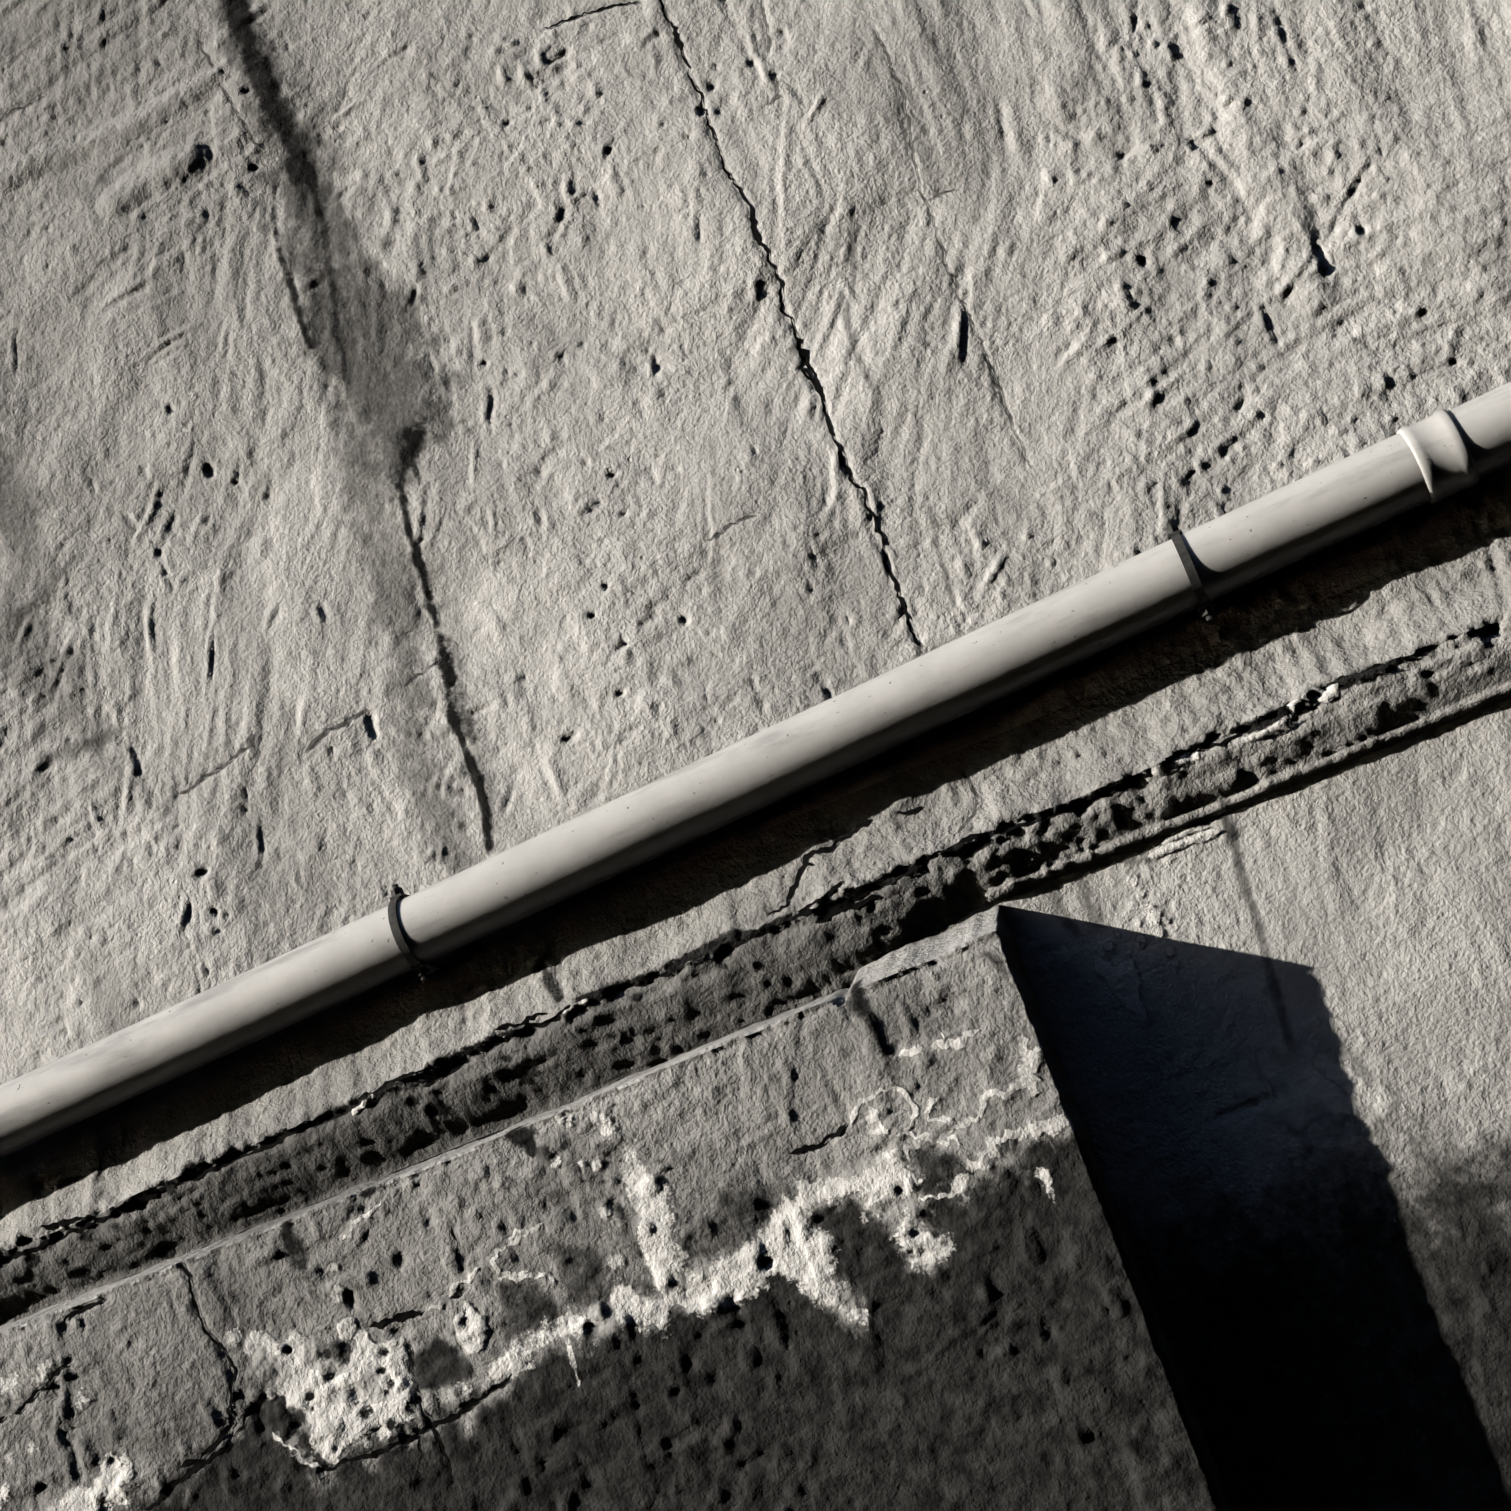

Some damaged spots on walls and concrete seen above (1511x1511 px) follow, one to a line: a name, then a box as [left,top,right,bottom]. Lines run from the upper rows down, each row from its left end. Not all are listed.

water stain [219,0,492,853]
crack [543,0,923,648]
crack [873,29,1032,469]
crack [0,701,1291,1264]
spalling [665,913,793,975]
water stain [845,980,894,1077]
spalling [1030,781,1122,823]
flaking render [1148,825,1223,858]
water stain [1219,802,1393,1131]
spalling [1230,660,1397,744]
crack [144,1223,554,1510]
water stain [45,1108,1511,1511]